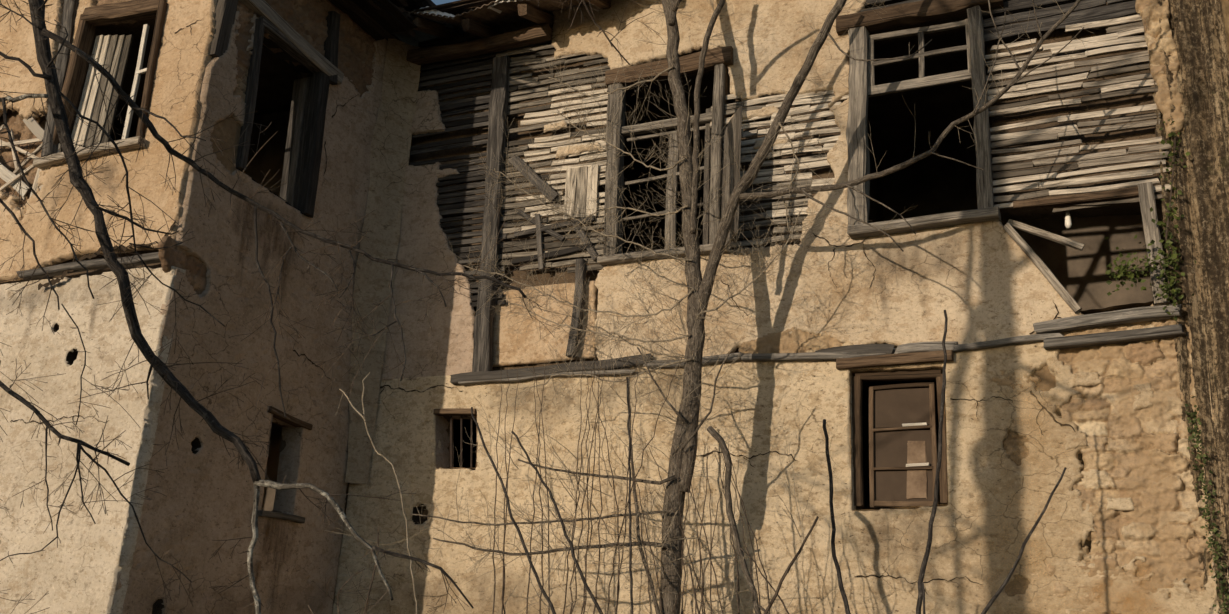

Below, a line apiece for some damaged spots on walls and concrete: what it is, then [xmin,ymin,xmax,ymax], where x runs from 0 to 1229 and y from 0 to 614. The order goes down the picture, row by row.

spalling [0,110,50,207]
flaking render [408,31,611,307]
flaking render [710,89,849,249]
flaking render [158,236,207,295]
spalling [739,327,854,369]
spalling [982,0,1229,614]